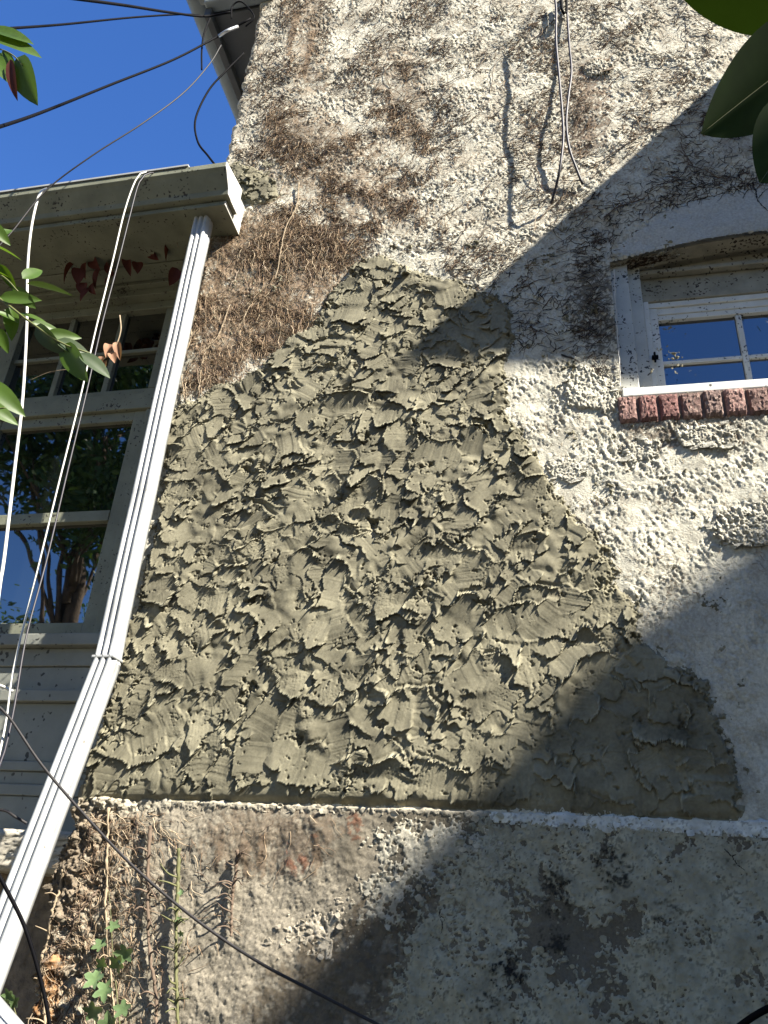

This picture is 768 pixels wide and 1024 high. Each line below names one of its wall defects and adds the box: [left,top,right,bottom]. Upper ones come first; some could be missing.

peeling [42,796,768,1024]
damp [539,867,571,958]
damp [596,845,632,891]
damp [476,948,527,1012]